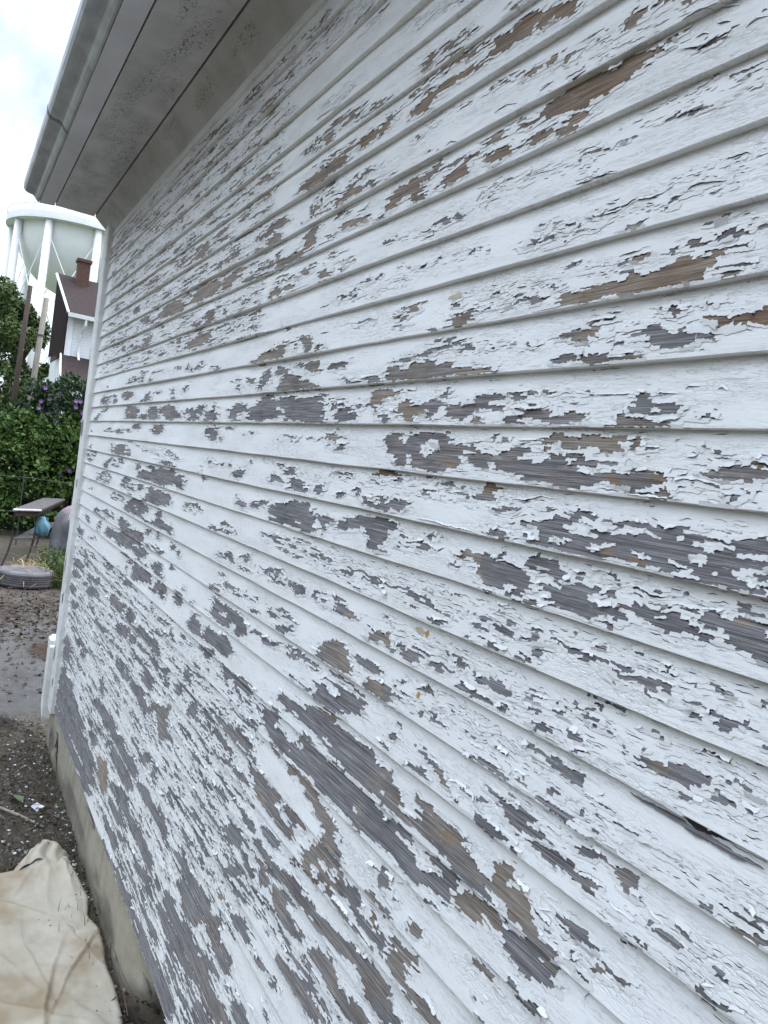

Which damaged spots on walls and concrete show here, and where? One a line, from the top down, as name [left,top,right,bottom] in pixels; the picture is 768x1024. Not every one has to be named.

peeling [81,0,768,668]
peeling [51,442,768,1024]
crack [258,529,768,926]